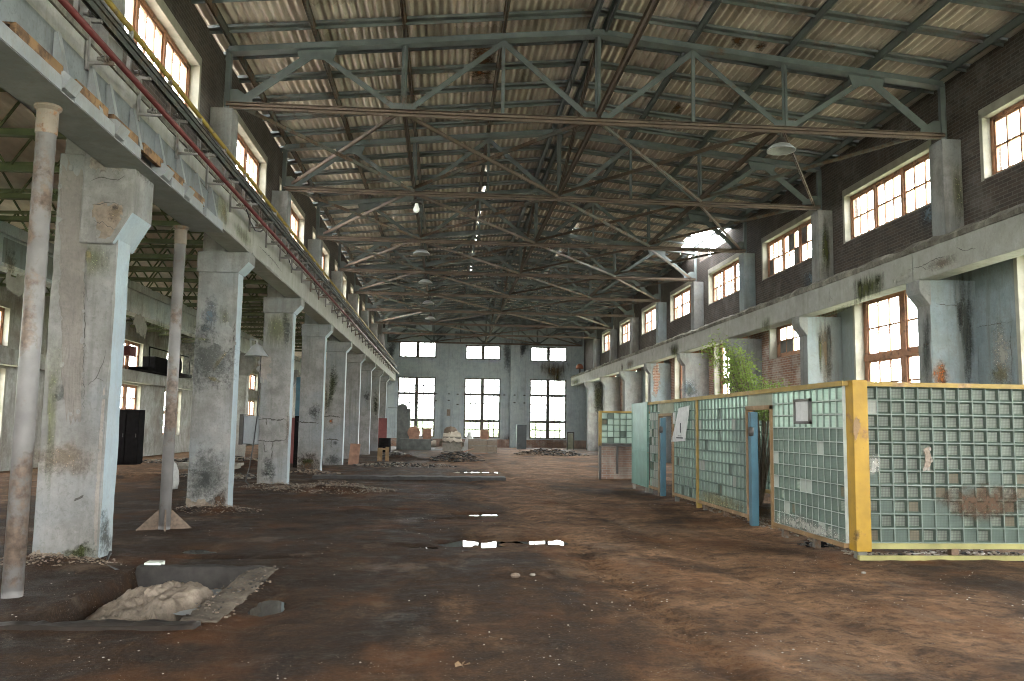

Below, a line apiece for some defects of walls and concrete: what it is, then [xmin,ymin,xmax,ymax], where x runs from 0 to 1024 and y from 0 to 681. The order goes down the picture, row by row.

peeling [56,157,127,426]
damp [188,298,233,389]
damp [819,328,831,375]
corrosion [933,363,947,383]
damp [958,282,973,382]
crack [258,415,340,457]
damp [189,450,221,496]